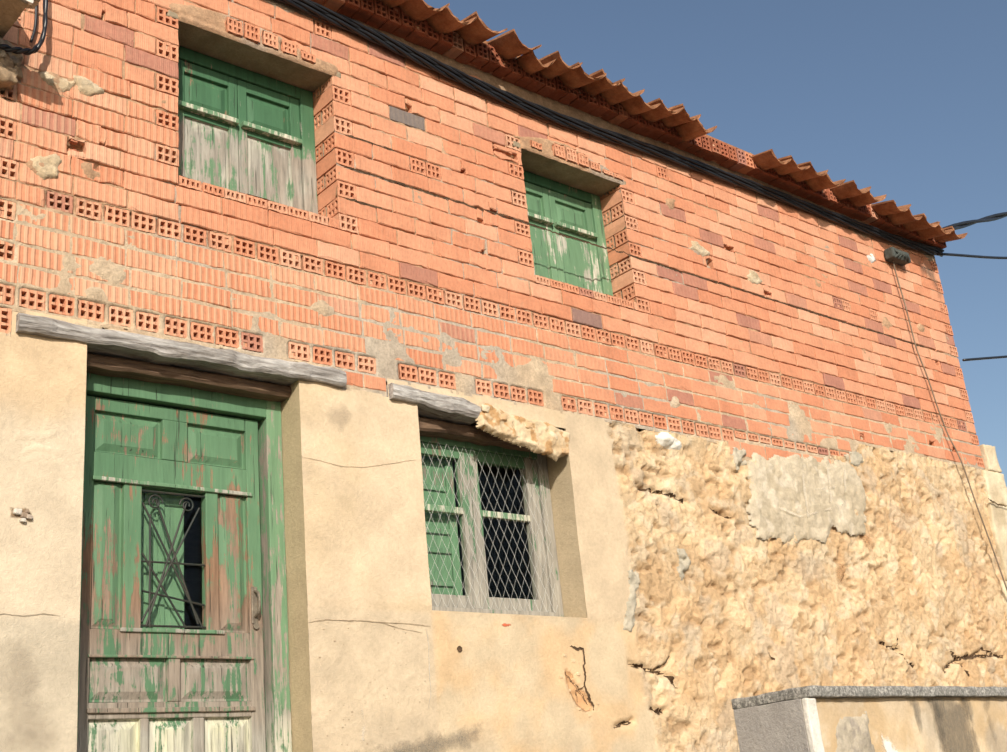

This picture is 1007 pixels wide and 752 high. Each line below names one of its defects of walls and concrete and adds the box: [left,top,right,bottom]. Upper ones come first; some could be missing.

flaking render [475,403,570,462]
crack [565,645,594,710]
crack [879,638,914,668]
crack [943,647,1003,677]